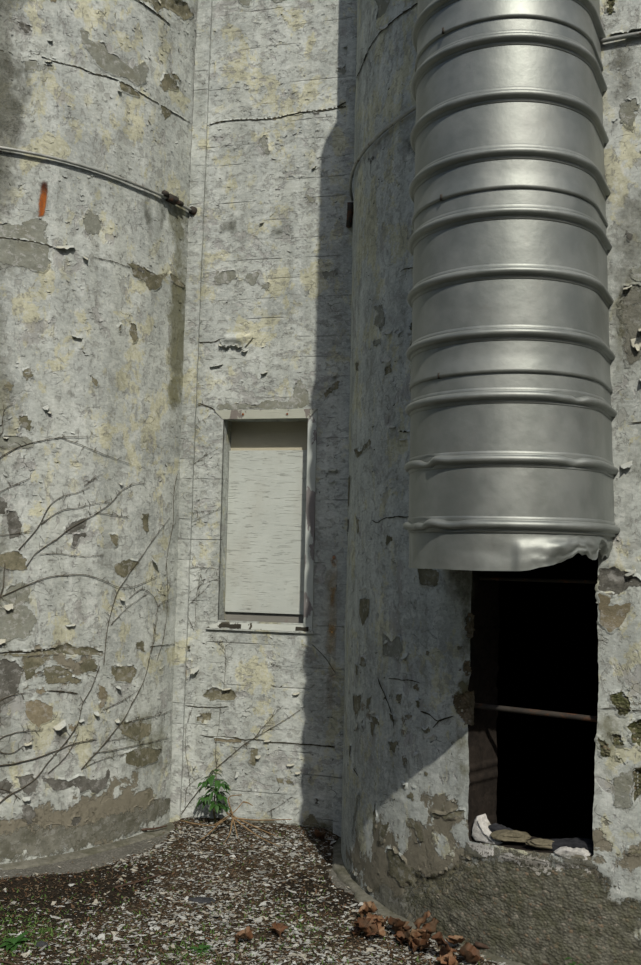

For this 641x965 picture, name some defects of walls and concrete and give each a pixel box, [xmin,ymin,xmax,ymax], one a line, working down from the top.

crack [356,2,417,78]
crack [41,55,348,125]
peeling [204,66,341,232]
rust [39,182,47,216]
peeling [615,266,641,369]
peeling [15,361,34,385]
peeling [204,371,339,410]
spalling [0,412,641,965]